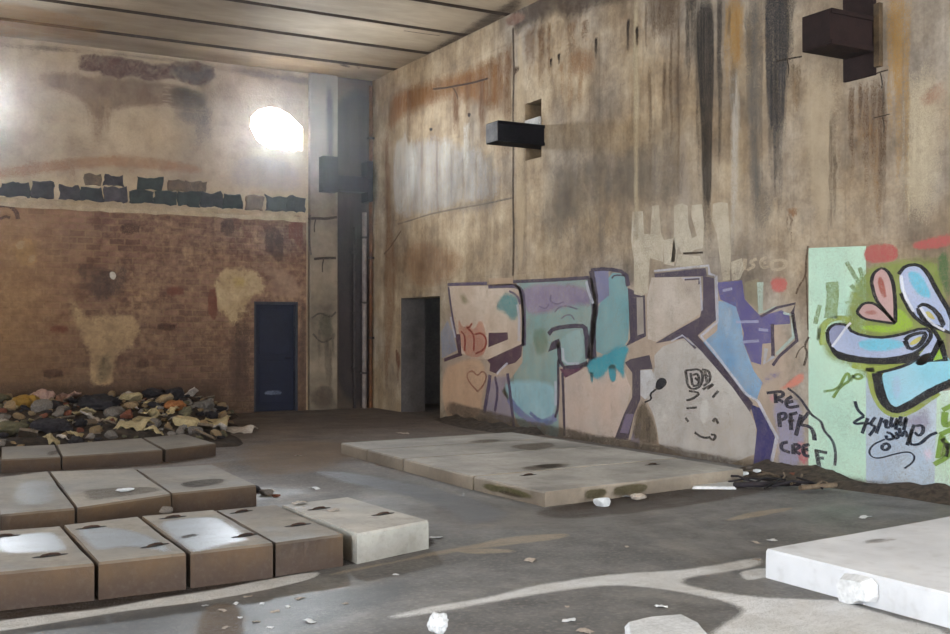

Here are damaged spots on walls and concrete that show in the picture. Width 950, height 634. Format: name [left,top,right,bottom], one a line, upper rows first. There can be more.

damp [37,71,215,156]
rust [383,41,513,384]
damp [524,0,845,263]